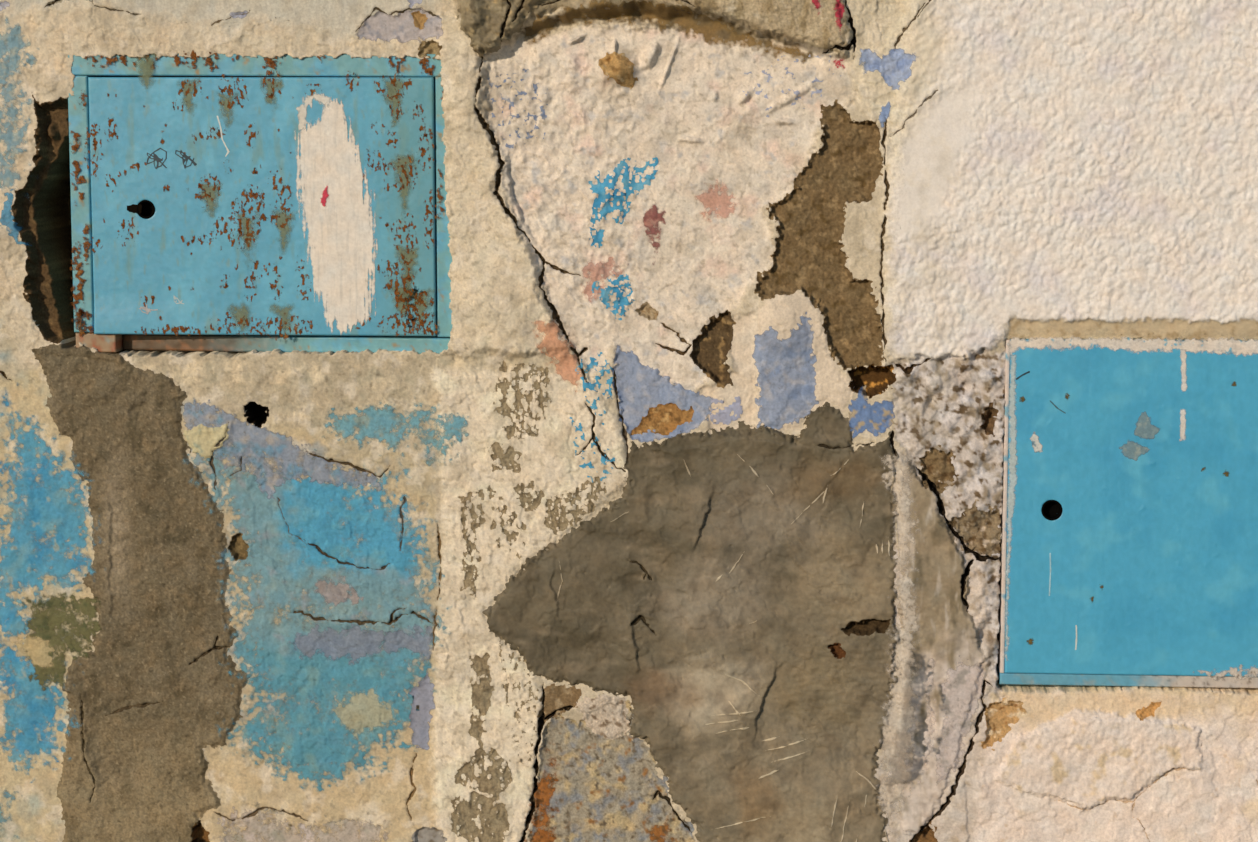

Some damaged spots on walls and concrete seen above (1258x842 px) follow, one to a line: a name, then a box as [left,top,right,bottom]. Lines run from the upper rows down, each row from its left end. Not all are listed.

crack [474,0,629,472]
peeling [744,49,916,399]
crack [655,323,691,355]
spalling [228,533,249,561]
crack [277,451,406,570]
crack [293,526,442,648]
peeling [458,310,736,597]
crack [818,430,999,611]
crack [910,680,992,842]
crack [1054,768,1197,842]